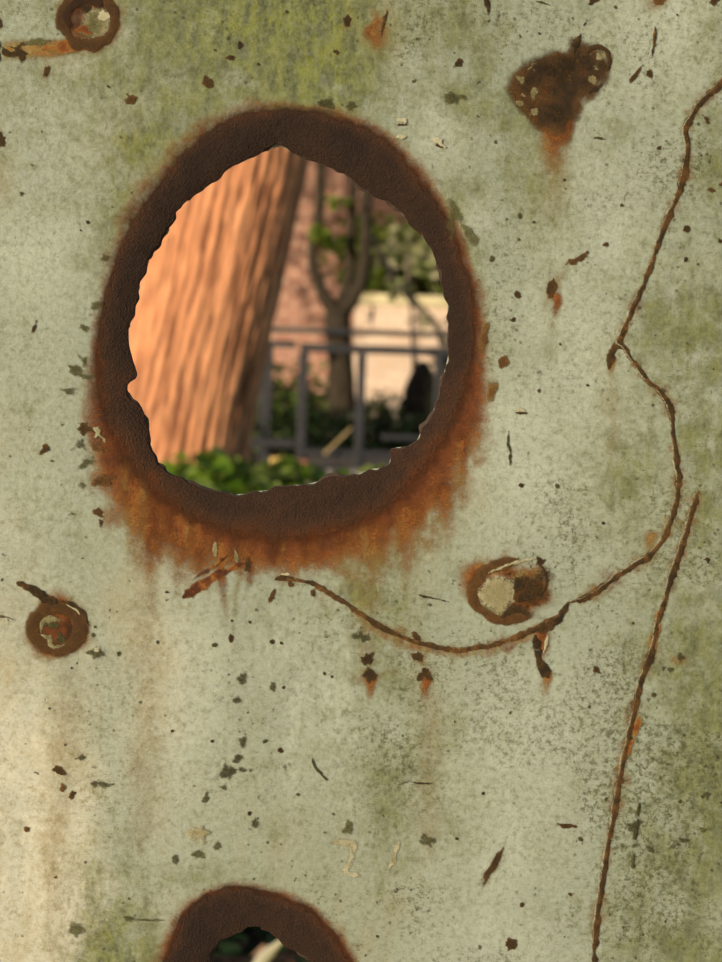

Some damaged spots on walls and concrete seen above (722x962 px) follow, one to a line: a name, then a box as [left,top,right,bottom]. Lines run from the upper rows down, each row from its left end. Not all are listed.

corrosion [0,0,119,62]
corrosion [507,22,613,169]
corrosion [84,103,487,599]
crack [268,77,722,962]
corrosion [16,581,89,659]
corrosion [462,556,552,626]
corrosion [160,884,355,962]